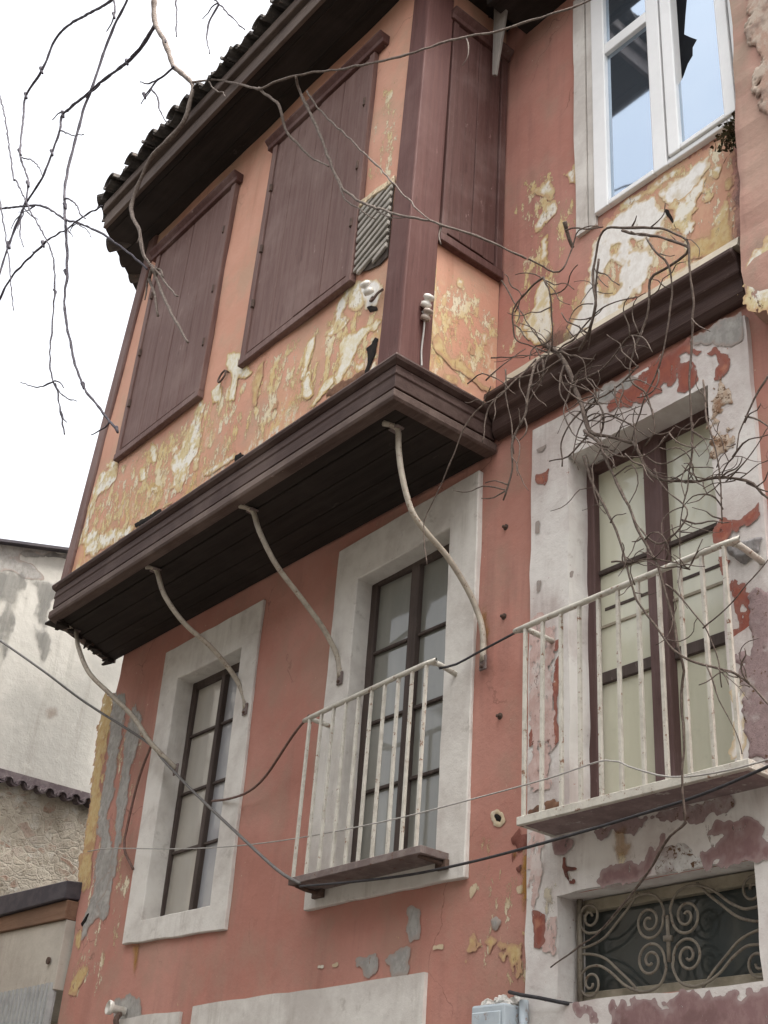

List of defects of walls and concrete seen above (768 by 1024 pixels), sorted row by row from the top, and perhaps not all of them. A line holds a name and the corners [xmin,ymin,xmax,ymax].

flaking render [744,0,768,115]
peeling [78,82,400,557]
peeling [431,130,738,392]
peeling [737,284,768,314]
peeling [745,235,768,268]
peeling [607,337,735,459]
flaking render [712,502,768,763]
peeling [78,693,135,908]
peeling [594,795,768,889]
peeling [68,908,120,997]
peeling [572,987,768,1024]